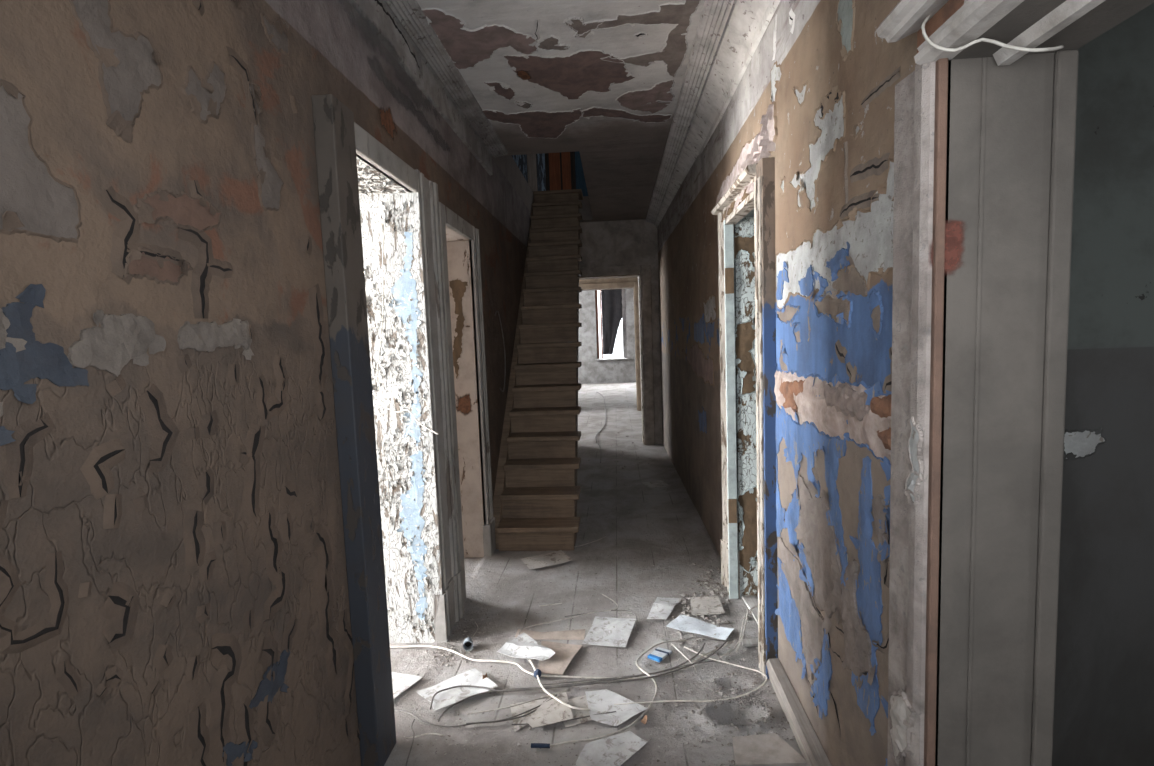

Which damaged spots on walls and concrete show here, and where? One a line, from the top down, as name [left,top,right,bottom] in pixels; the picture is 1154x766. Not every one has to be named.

peeling [357,160,413,238]
peeling [421,0,701,138]
peeling [734,233,755,272]
peeling [716,60,846,213]
peeling [735,318,756,396]
flaking render [774,158,924,563]
peeling [364,265,434,632]
peeling [737,485,757,573]
peeling [776,448,883,719]